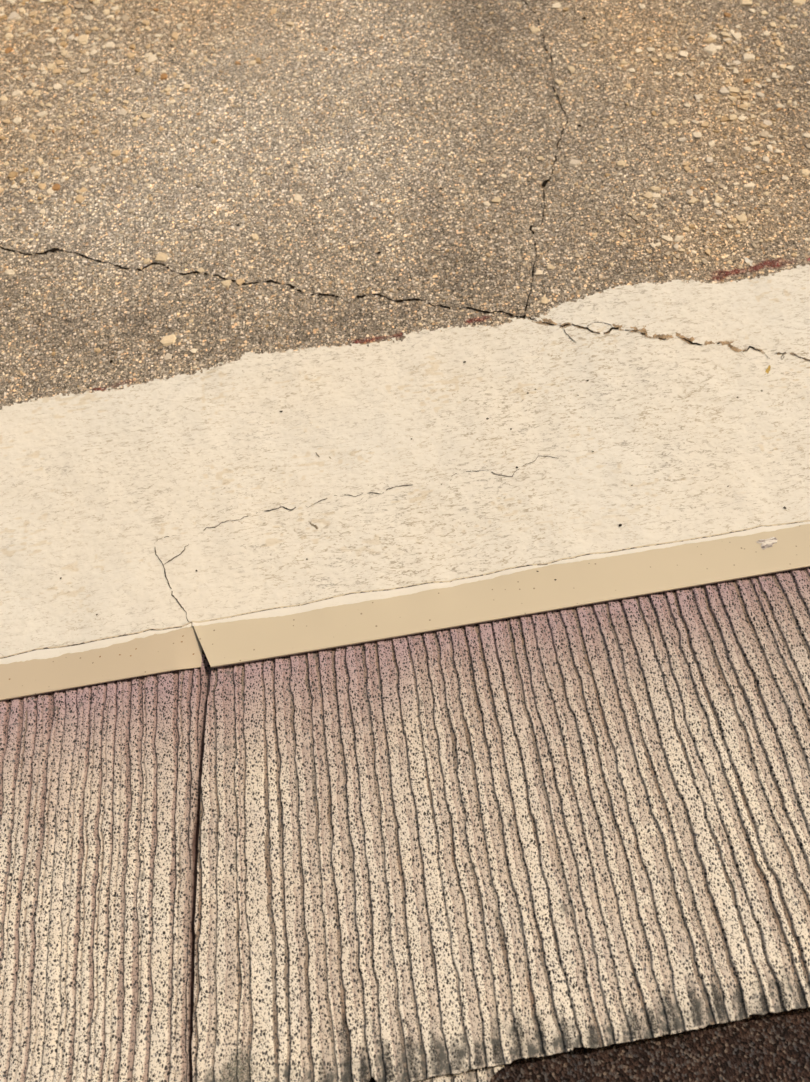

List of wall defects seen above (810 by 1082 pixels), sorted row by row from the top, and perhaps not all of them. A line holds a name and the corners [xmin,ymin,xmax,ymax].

crack [0,0,810,361]
crack [0,485,408,659]